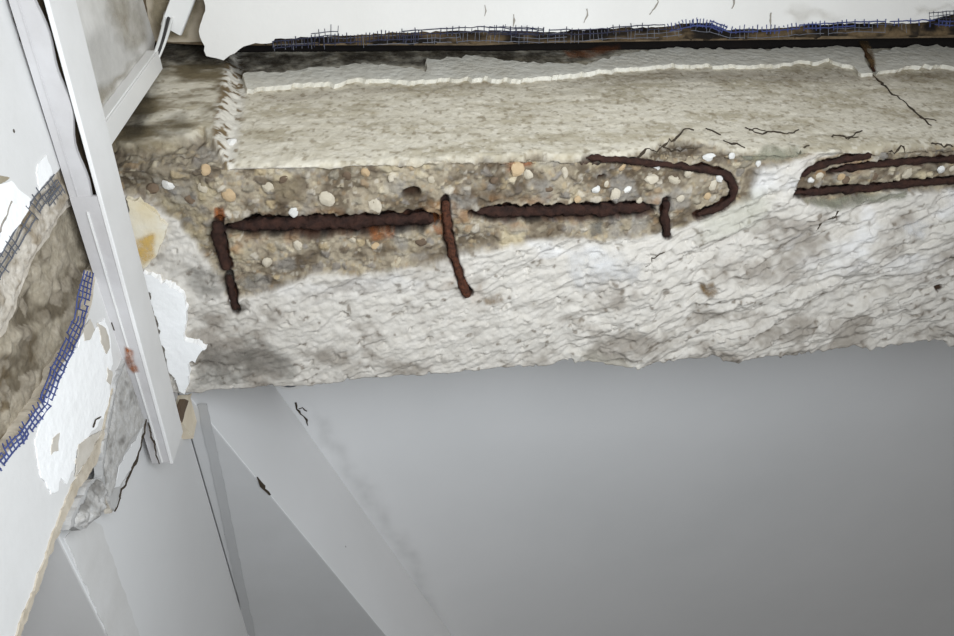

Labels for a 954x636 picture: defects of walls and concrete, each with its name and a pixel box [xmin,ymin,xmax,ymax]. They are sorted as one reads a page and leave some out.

peeling [0,176,31,253]
peeling [36,155,53,191]
spalling [112,131,954,298]
crack [637,127,810,158]
crack [861,45,953,148]
peeling [15,318,145,636]
crack [114,419,160,512]